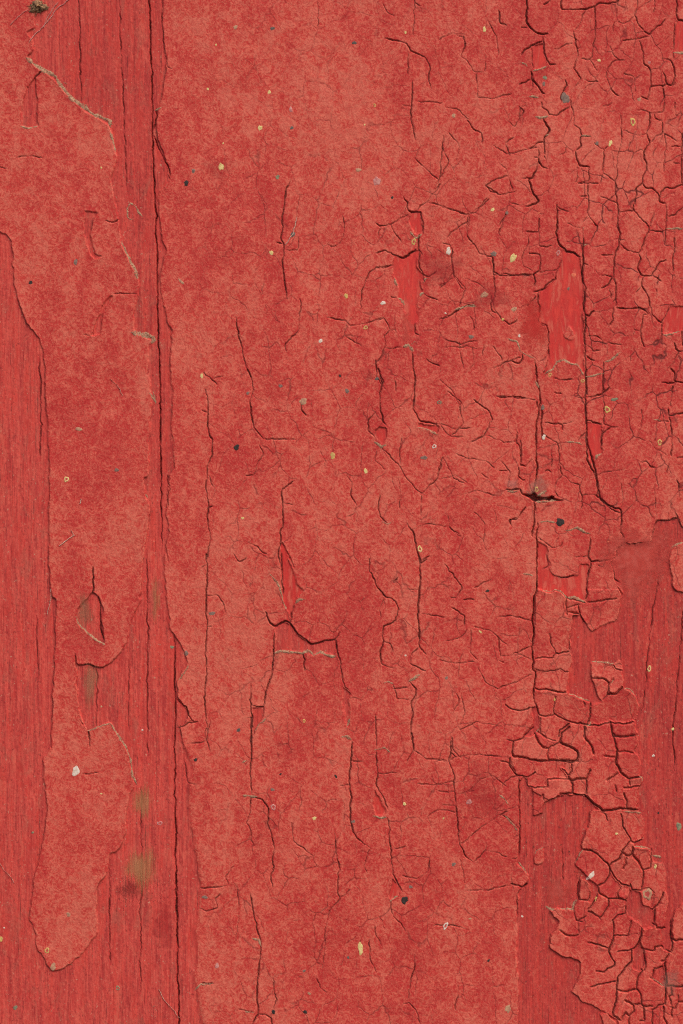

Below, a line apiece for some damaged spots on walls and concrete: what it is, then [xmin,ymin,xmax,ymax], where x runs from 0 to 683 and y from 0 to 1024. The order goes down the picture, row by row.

peeling [0,0,203,1024]
crack [118,0,351,1024]
peeling [375,196,439,352]
crack [275,0,683,892]
peeling [532,203,604,381]
peeling [243,543,407,933]
crack [368,926,383,974]
crack [401,962,421,1024]
crack [431,923,470,931]
peeling [498,409,683,1024]